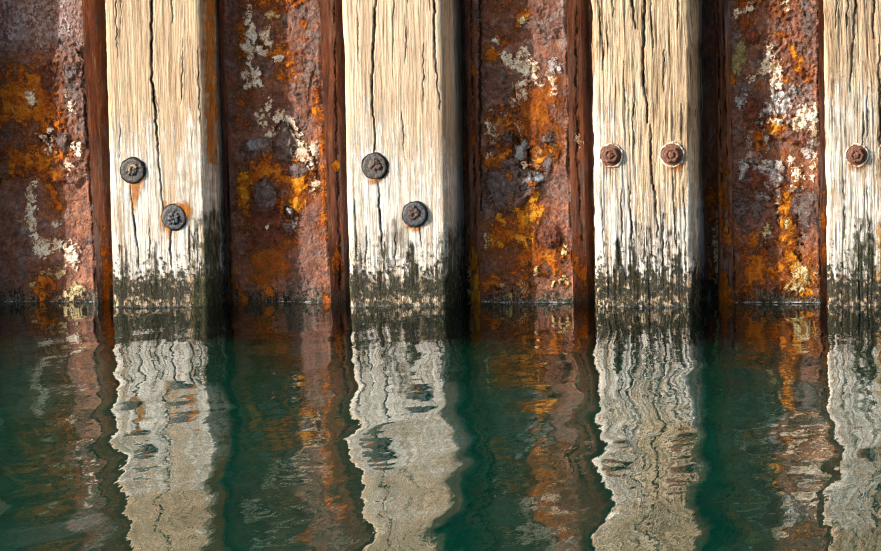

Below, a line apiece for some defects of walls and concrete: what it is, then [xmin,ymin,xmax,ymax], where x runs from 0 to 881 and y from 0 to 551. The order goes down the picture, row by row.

crack [104,0,122,54]
crack [130,187,191,270]
crack [150,0,173,209]
water stain [110,103,226,300]
crack [181,45,200,119]
crack [354,191,397,266]
crack [357,0,441,150]
water stain [346,96,464,300]
crack [598,0,687,265]
water stain [593,75,705,300]
water stain [824,80,881,300]
crack [831,0,881,140]